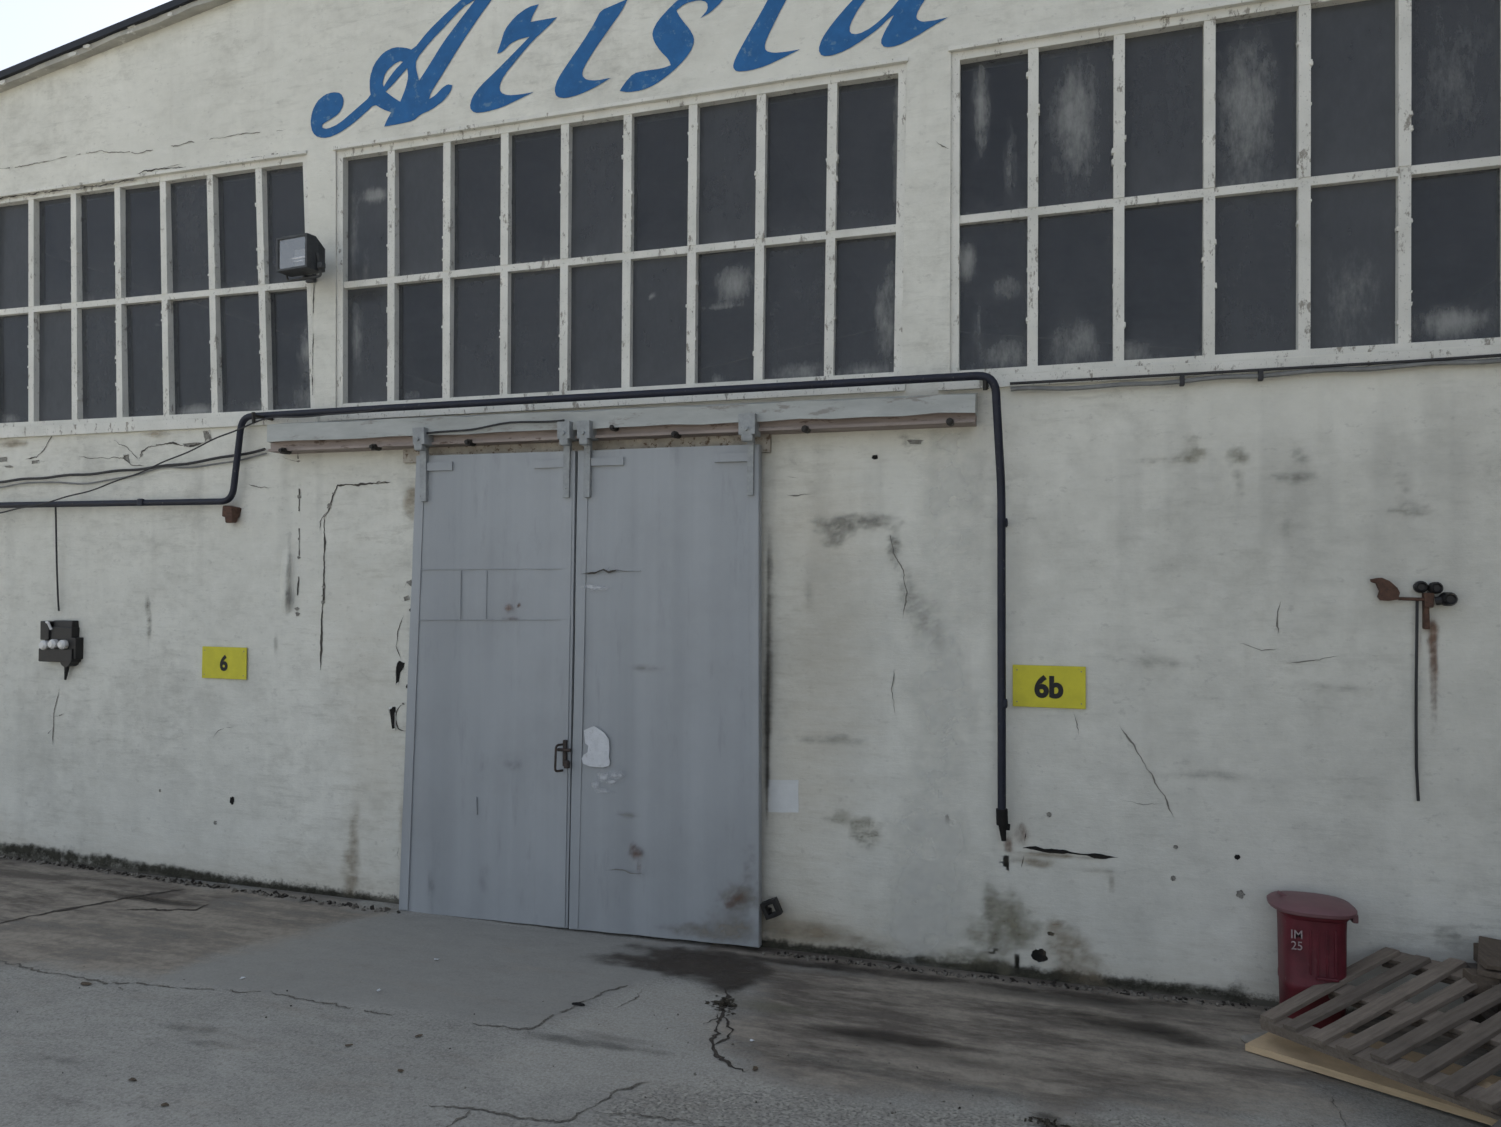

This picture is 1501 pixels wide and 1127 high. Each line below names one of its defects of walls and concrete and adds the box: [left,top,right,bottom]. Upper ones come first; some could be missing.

water stain [825,518,880,542]
crack [249,456,389,670]
crack [890,536,908,614]
rust [1429,623,1437,672]
crack [1120,727,1173,815]
crack [1,889,208,923]
crack [2,961,390,1015]
crack [473,985,642,1030]
crack [707,990,748,1072]
water stain [693,888,1245,1046]
crack [428,1082,726,1127]